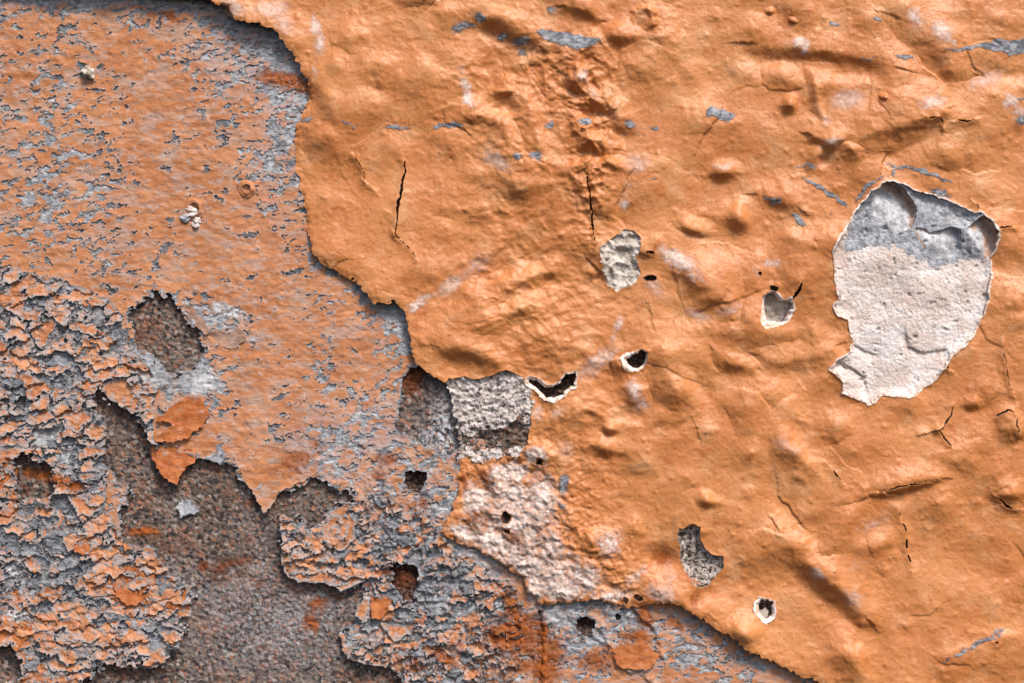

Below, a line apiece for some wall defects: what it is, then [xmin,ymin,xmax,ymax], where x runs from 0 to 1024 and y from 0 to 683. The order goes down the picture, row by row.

crack [395,161,416,257]
crack [585,173,595,246]
peeling [599,229,641,292]
peeling [828,180,1001,406]
spalling [0,267,535,683]
peeling [677,524,724,588]
peeling [612,640,659,671]